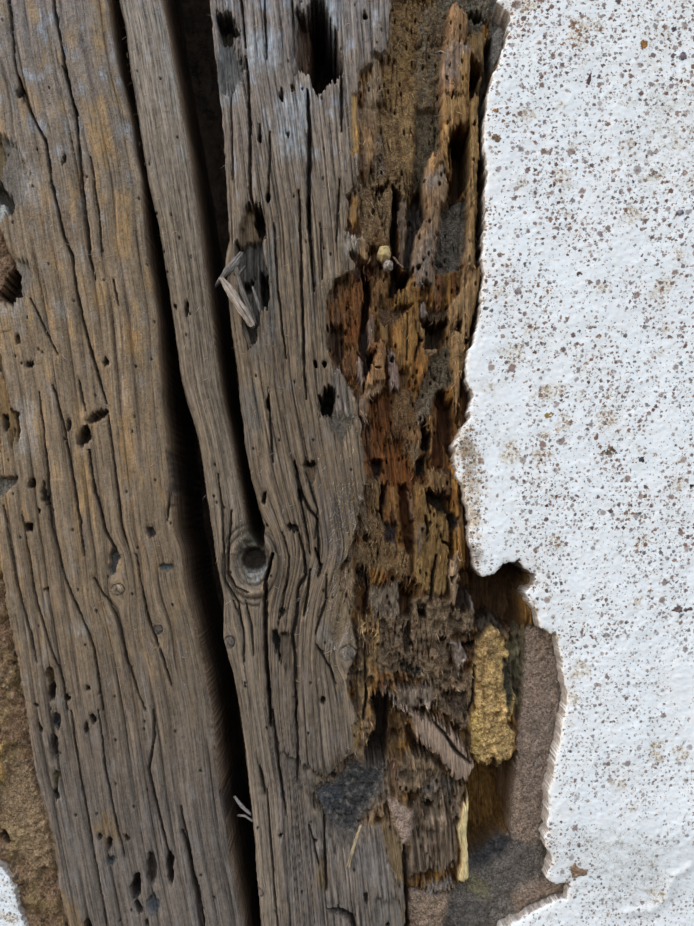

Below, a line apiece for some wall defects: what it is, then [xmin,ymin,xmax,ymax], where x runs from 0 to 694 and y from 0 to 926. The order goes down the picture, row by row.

spalling [303,2,343,97]
spalling [484,0,505,81]
spalling [446,126,473,207]
spalling [0,230,23,308]
spalling [389,272,413,301]
spalling [319,386,335,418]
spalling [415,419,431,477]
spalling [425,488,448,516]
spalling [0,570,69,926]
spalling [364,688,393,766]
spalling [408,562,588,926]